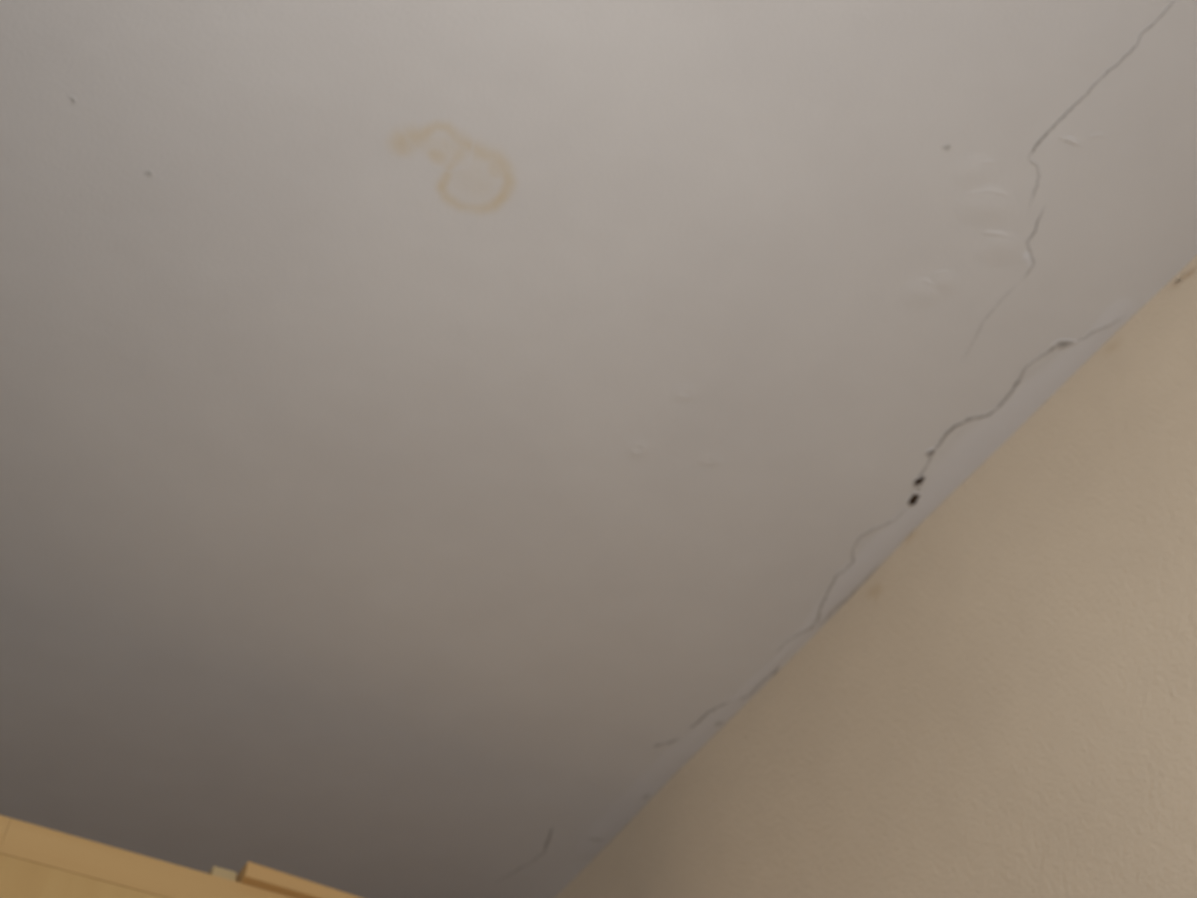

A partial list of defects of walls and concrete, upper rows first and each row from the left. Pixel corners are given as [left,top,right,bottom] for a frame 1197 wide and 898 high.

leakage [379,114,526,224]
crack [960,0,1175,365]
crack [649,315,1126,749]